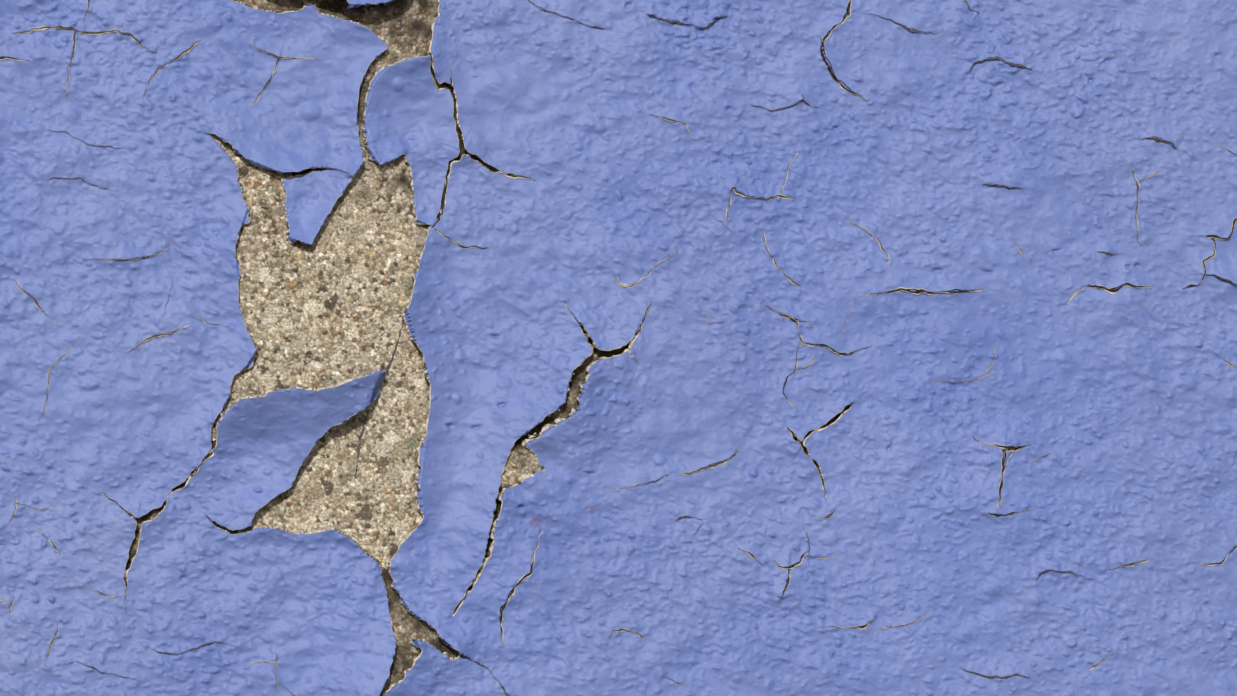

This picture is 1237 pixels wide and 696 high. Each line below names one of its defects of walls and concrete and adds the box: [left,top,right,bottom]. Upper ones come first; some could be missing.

crack [0,0,201,101]
crack [819,0,942,101]
crack [430,53,533,249]
crack [90,427,217,611]
crack [204,513,254,534]
peeling [187,0,469,696]
crack [452,249,677,617]
crack [738,217,987,601]
crack [973,436,1056,517]
crack [1067,283,1151,306]
crack [1183,218,1237,289]
crack [460,530,543,696]